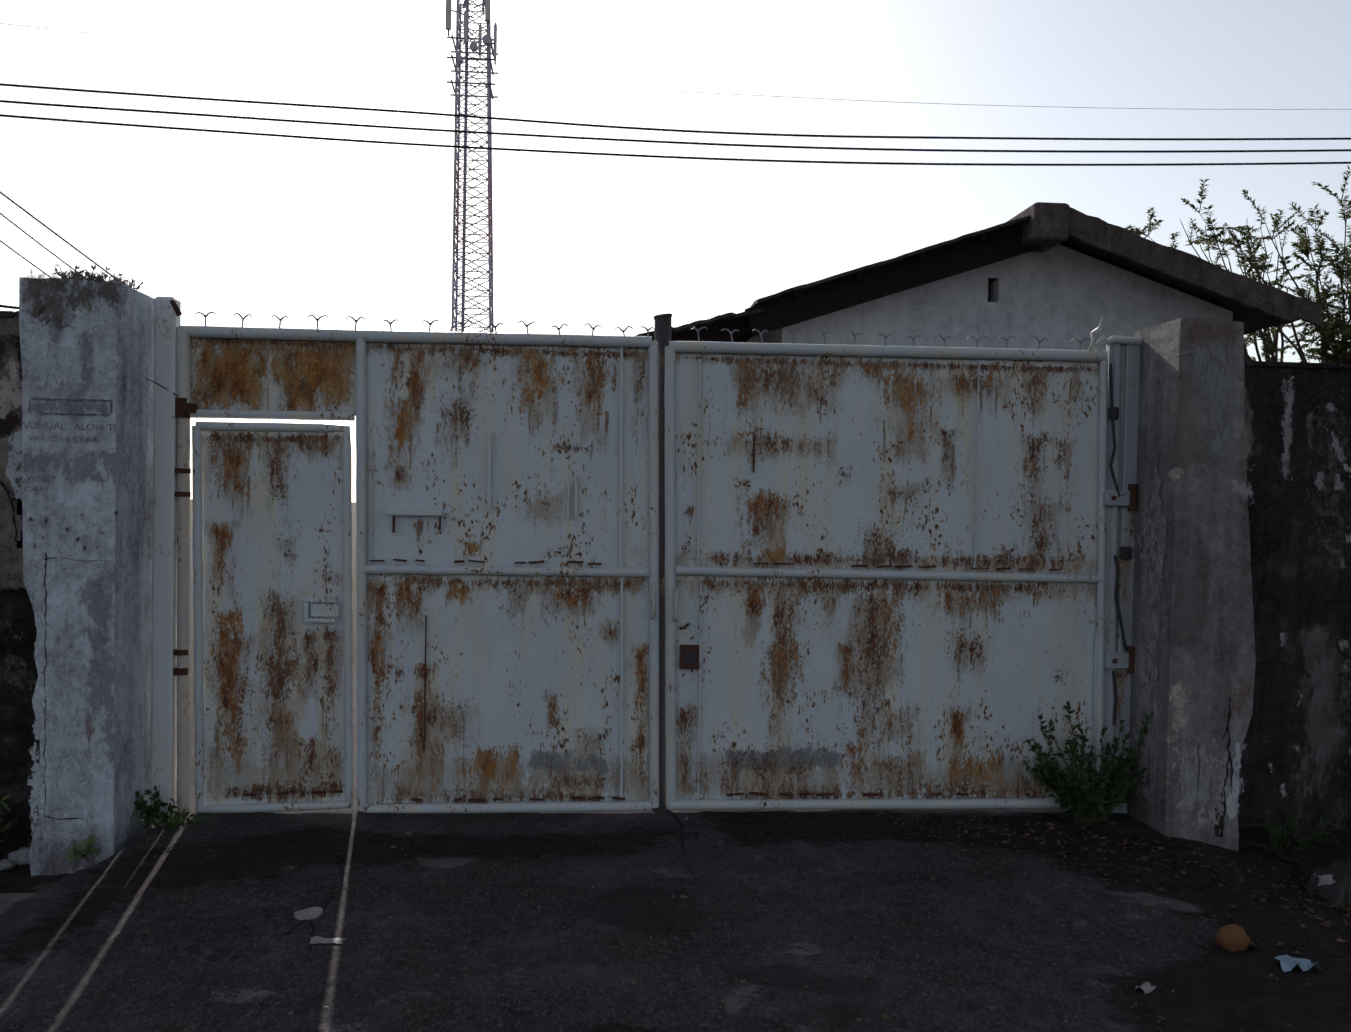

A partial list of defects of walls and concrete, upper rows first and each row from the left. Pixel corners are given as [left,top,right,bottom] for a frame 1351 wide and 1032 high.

leakage [0,331,108,437]
peeling [0,339,126,548]
leakage [23,269,129,357]
leakage [1281,376,1314,480]
peeling [1304,381,1351,579]
spalling [0,587,40,847]
leakage [1292,625,1346,797]